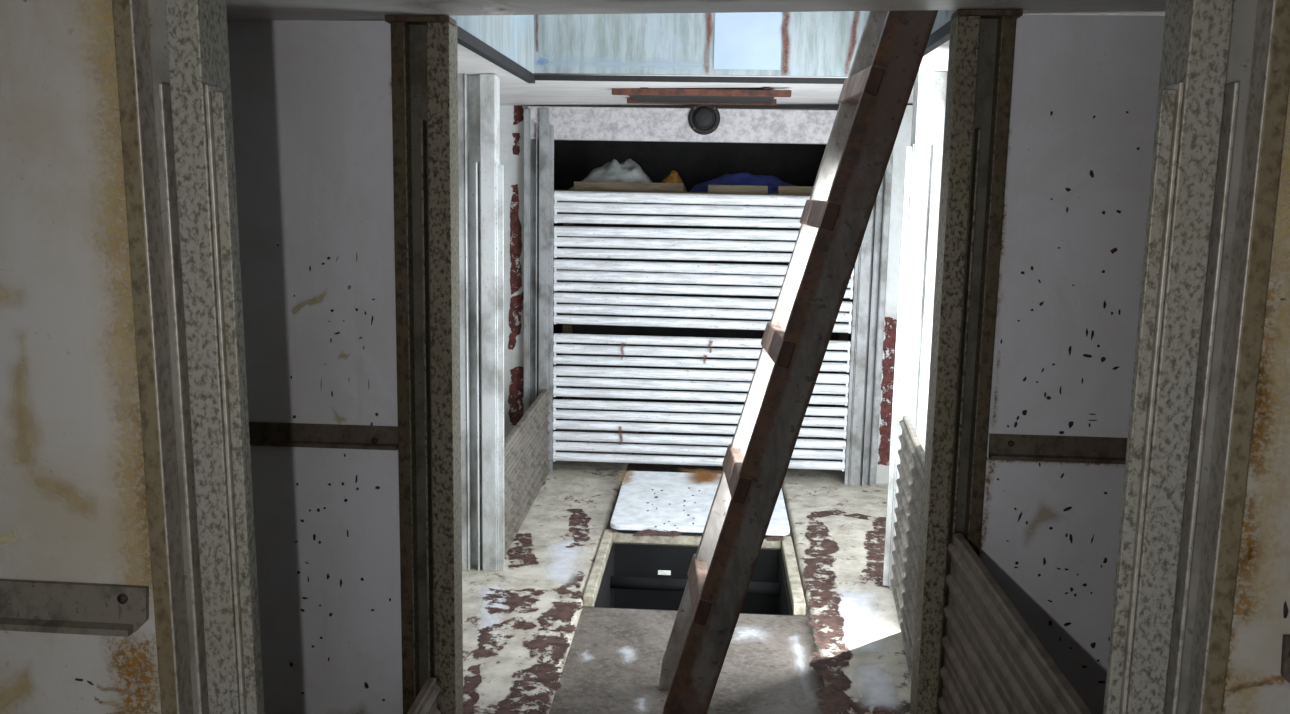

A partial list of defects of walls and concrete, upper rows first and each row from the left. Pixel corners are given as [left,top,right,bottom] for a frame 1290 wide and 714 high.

leakage [13,364,34,464]
rust [1222,84,1290,714]
rust [95,642,156,714]
peeling [463,487,700,714]
peeling [740,513,910,714]